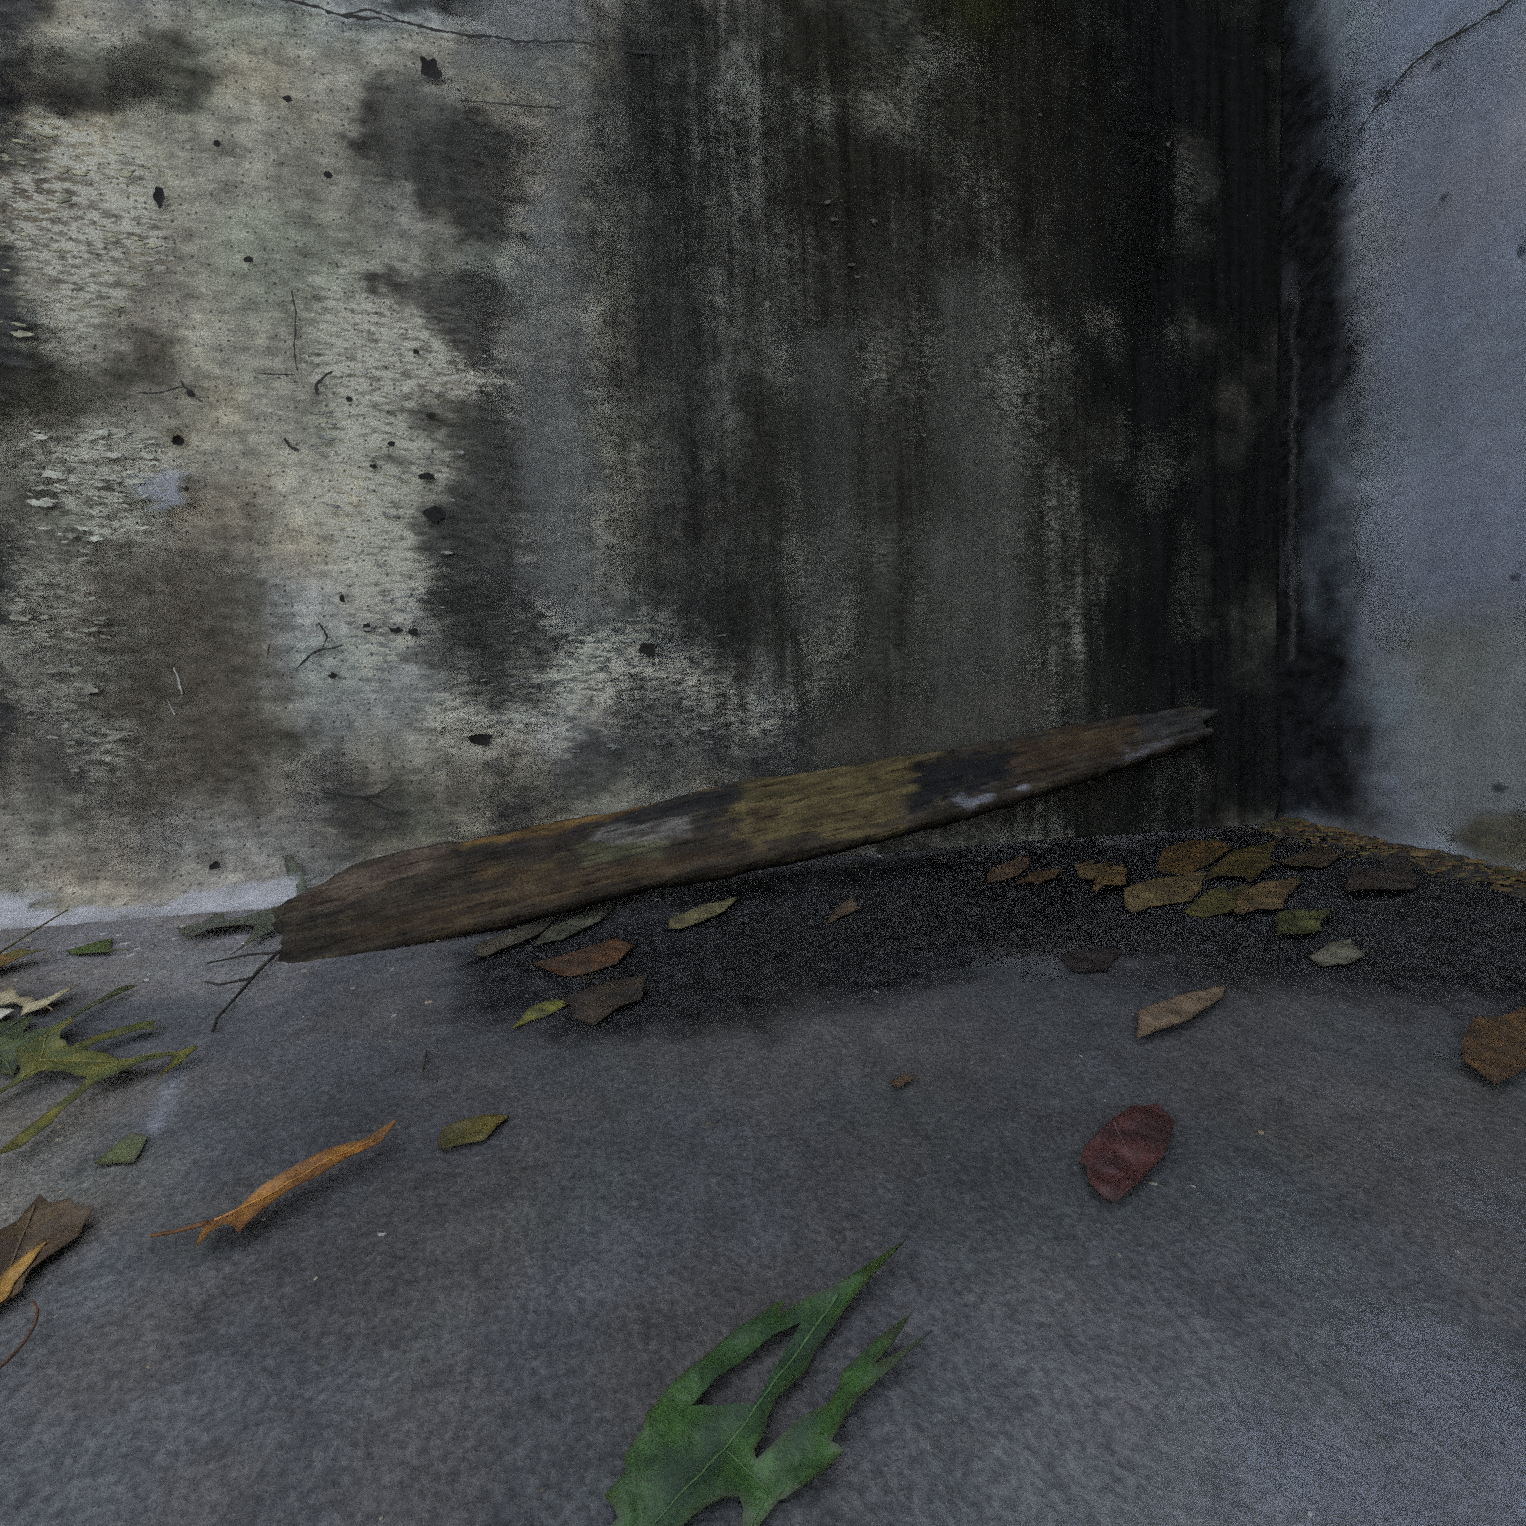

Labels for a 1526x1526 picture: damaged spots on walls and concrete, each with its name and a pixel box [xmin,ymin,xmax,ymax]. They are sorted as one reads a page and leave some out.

leakage [384,0,520,74]
crack [1358,0,1512,134]
leakage [341,82,527,244]
leakage [591,0,1143,771]
leakage [361,269,608,689]
leakage [322,778,408,852]
leakage [492,681,680,835]